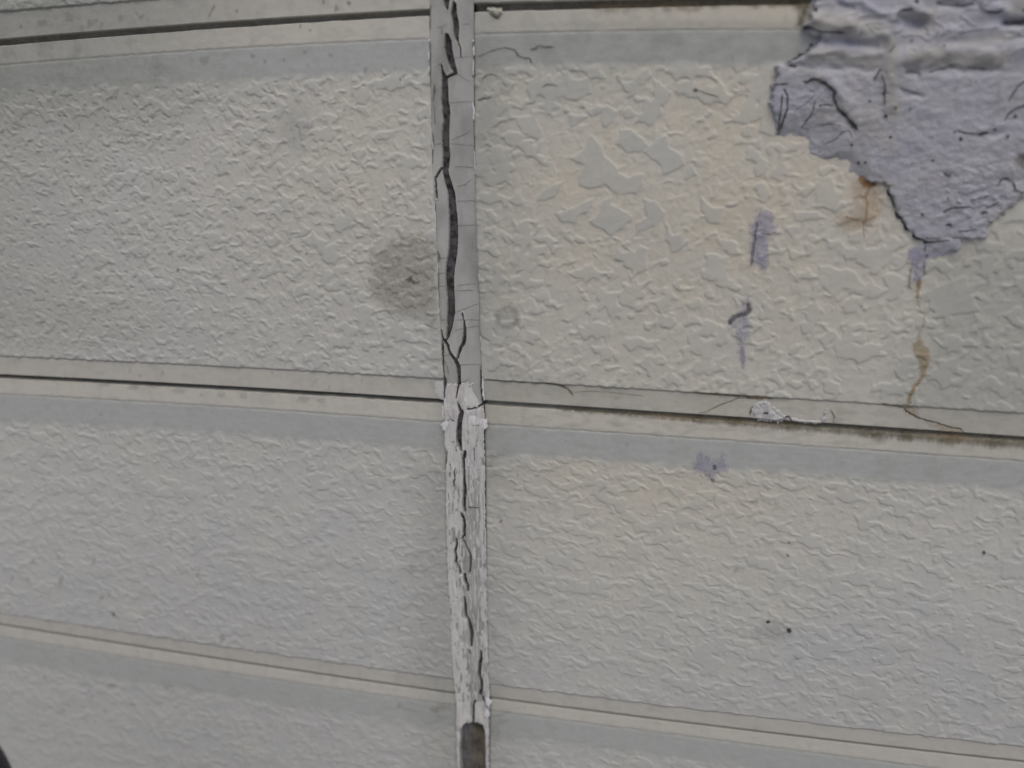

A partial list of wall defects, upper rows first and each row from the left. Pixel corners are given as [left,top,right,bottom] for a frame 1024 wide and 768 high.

crack [430,0,486,722]